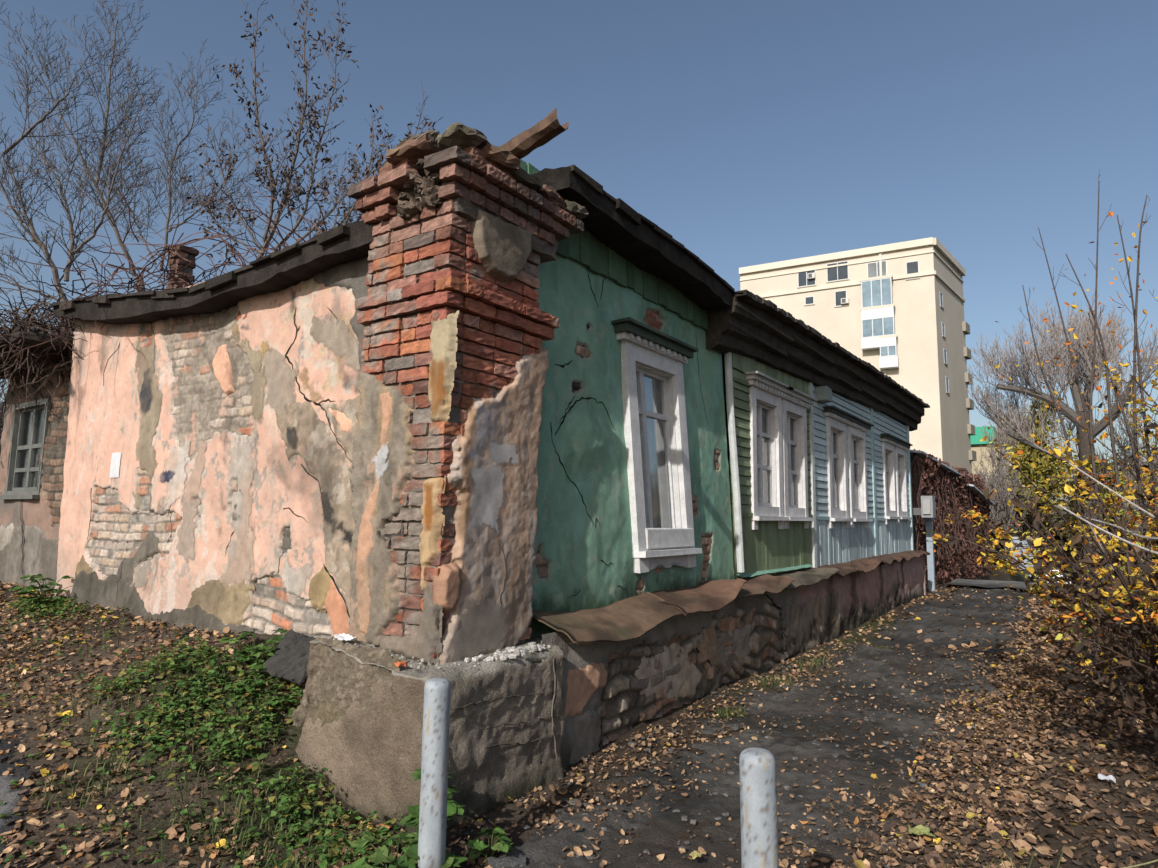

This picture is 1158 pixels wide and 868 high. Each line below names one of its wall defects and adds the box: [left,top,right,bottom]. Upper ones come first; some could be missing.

crack [283,464,328,525]
crack [285,308,352,462]
flaking render [87,122,590,729]
crack [550,395,614,528]